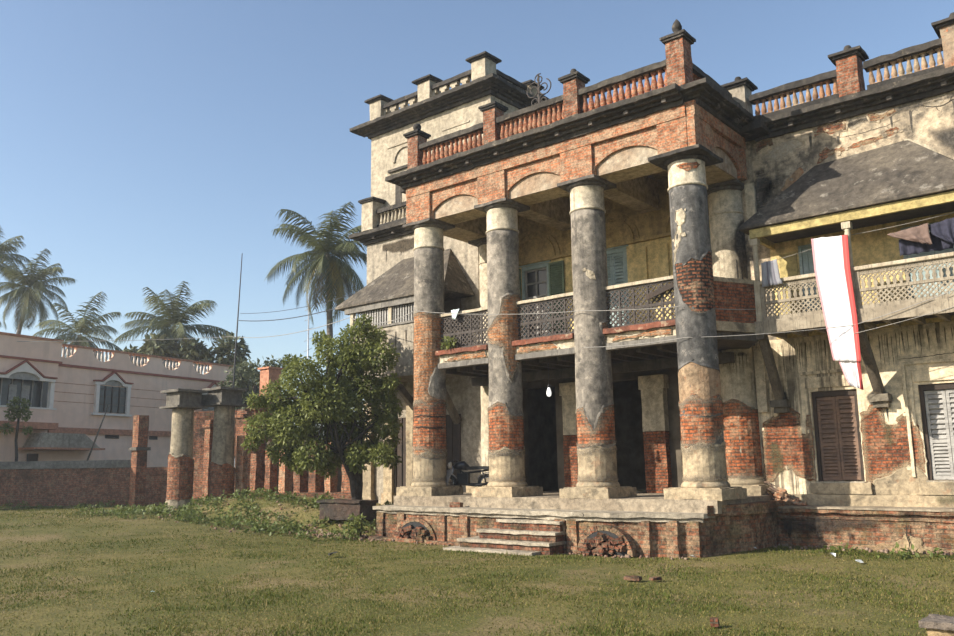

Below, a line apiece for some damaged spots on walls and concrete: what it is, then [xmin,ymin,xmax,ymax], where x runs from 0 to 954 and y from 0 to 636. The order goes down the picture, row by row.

flaking render [676,162,700,171]
leakage [756,132,812,211]
leakage [848,117,868,129]
leakage [889,94,954,129]
leakage [932,129,954,152]
flaking render [672,208,716,316]
flaking render [166,452,194,502]
flaking render [412,293,559,483]
flaking render [563,402,618,487]
flaking render [643,358,817,493]
flaking render [859,404,927,483]